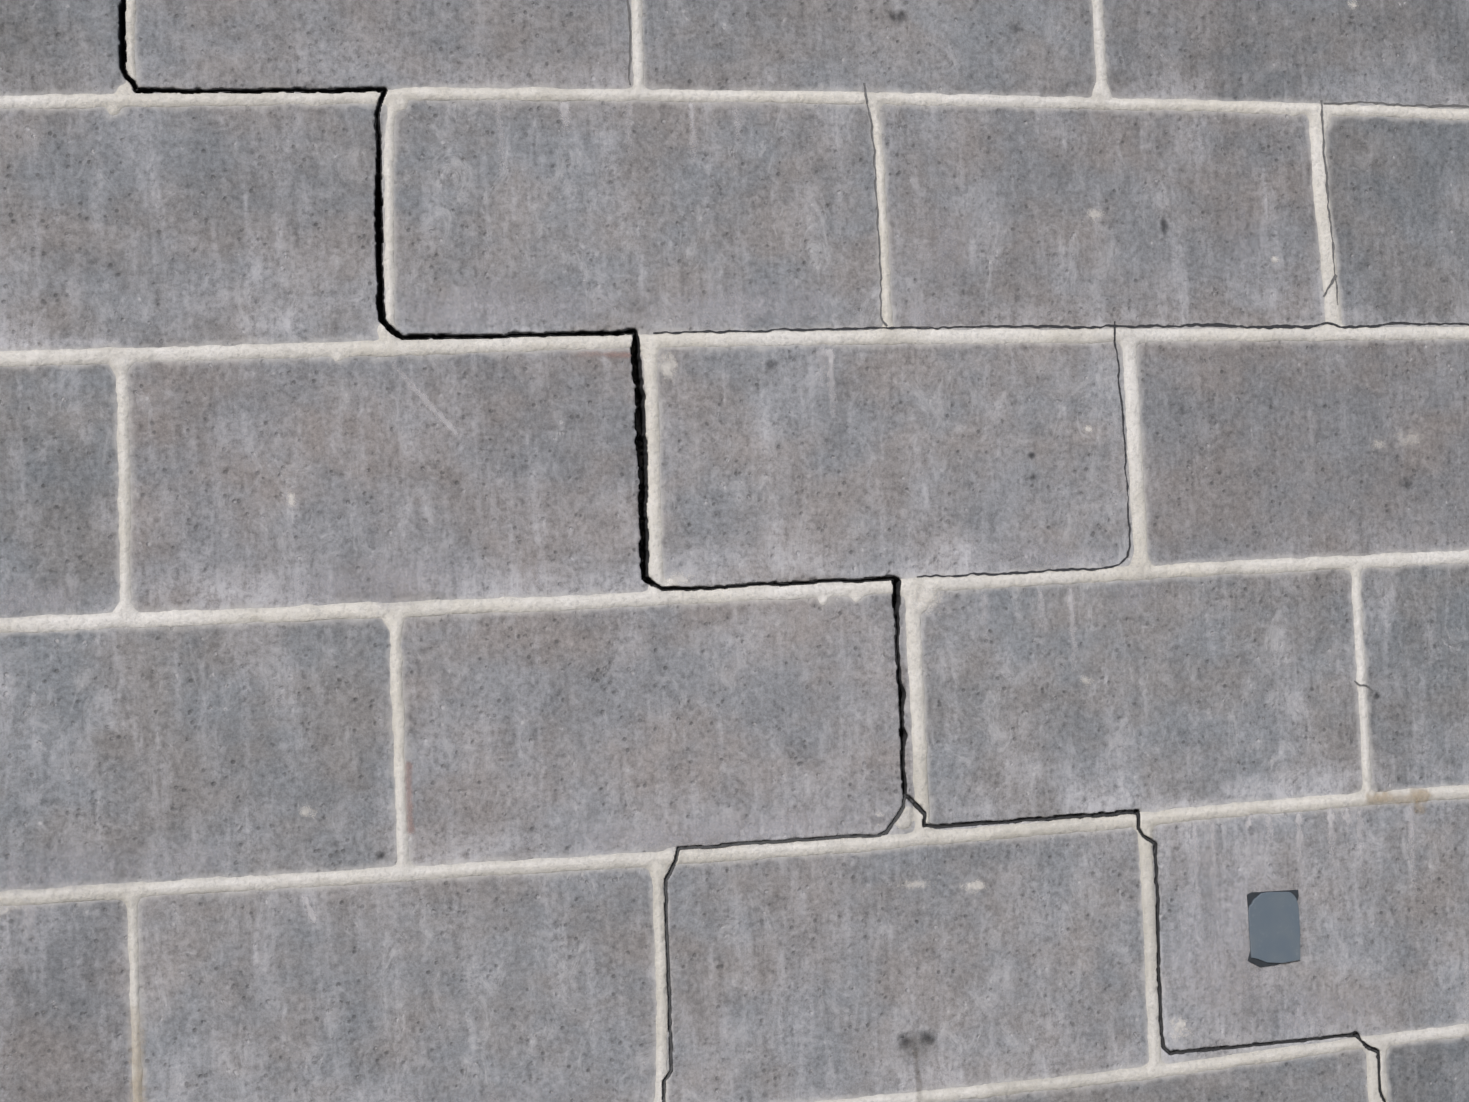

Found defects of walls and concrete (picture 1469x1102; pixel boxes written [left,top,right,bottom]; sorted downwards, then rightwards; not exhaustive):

crack [119,0,908,795]
crack [653,83,1469,577]
crack [662,793,1386,1102]